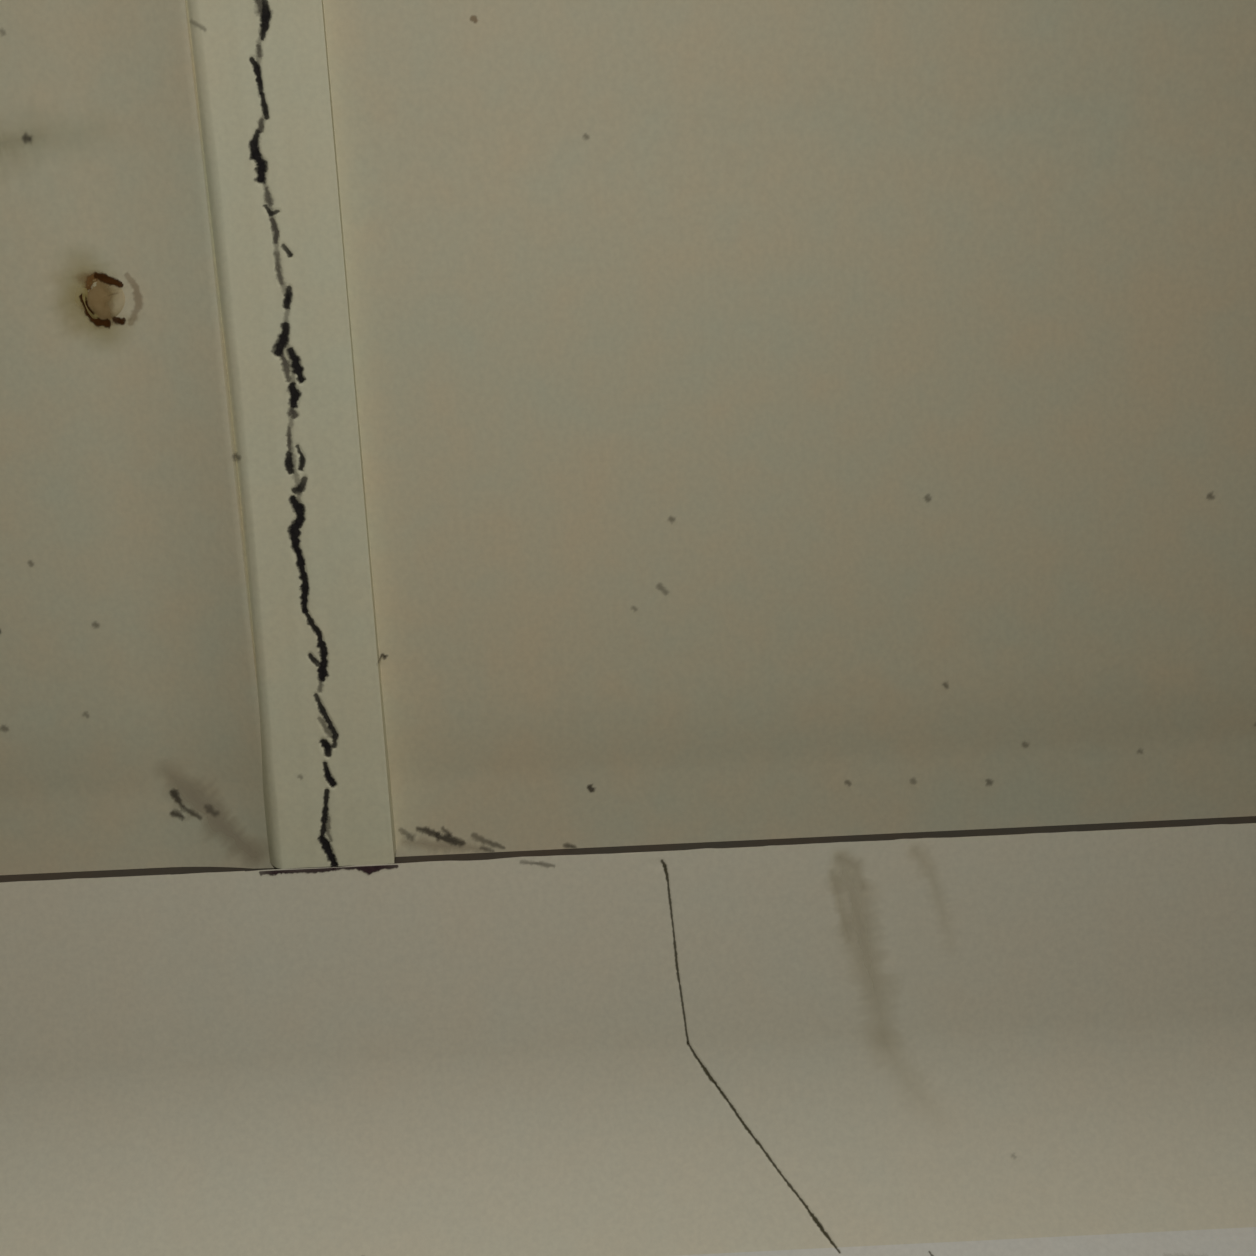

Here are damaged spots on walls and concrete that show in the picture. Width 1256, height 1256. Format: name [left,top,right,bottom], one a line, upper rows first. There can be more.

corrosion [75,273,126,328]
crack [249,0,398,875]
crack [661,860,840,1253]